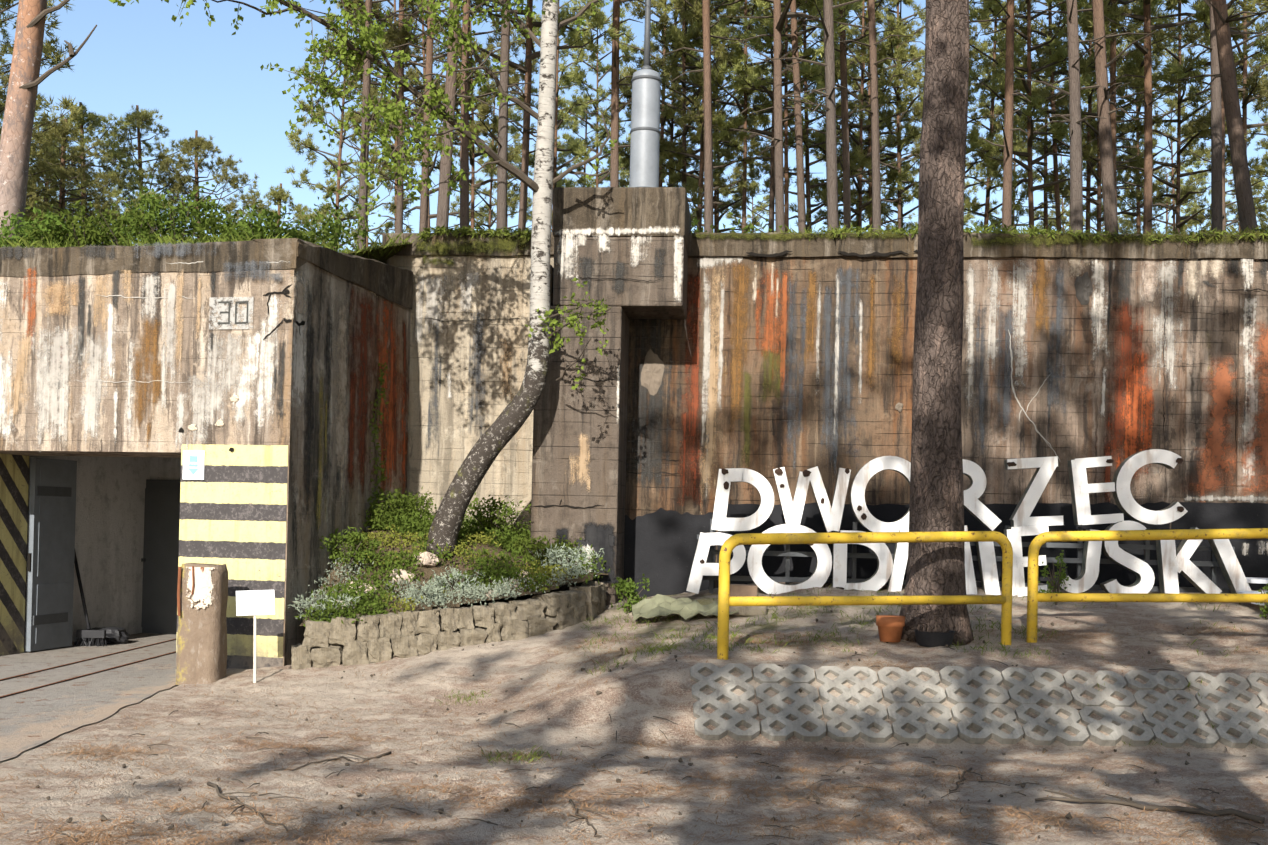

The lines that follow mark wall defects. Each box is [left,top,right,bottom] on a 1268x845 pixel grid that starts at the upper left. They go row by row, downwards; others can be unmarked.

leakage [0,335,31,436]
leakage [77,242,347,510]
rust [347,289,409,494]
rust [678,274,706,507]
leakage [557,227,863,506]
leakage [966,260,1031,454]
rust [1096,301,1154,502]
rust [1191,322,1268,502]